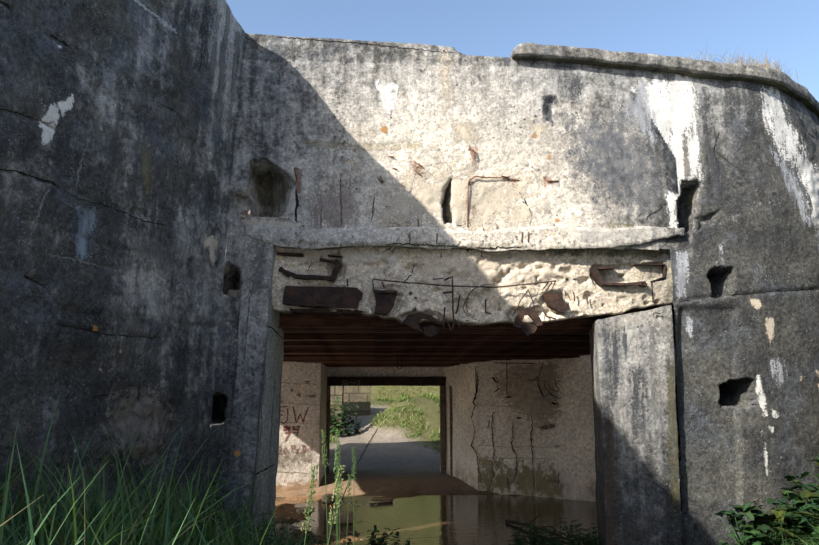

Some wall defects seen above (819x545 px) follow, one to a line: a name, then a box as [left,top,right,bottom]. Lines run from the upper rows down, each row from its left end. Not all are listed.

peeling [56,93,75,117]
crack [0,169,166,226]
spalling [364,118,576,331]
leakage [543,73,725,242]
leakage [759,85,819,252]
crack [471,372,536,494]
leakage [770,358,788,386]